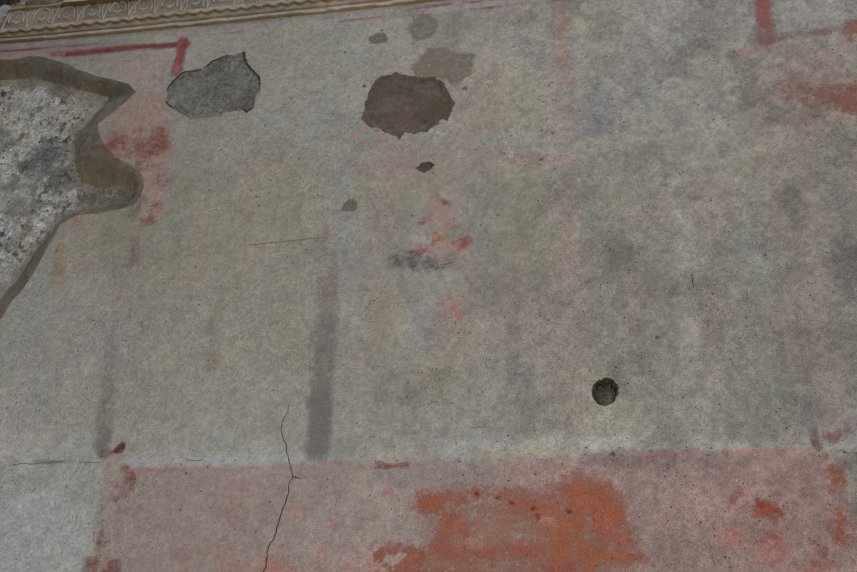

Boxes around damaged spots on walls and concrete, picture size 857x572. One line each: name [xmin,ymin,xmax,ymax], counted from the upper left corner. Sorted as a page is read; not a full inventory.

flaking render [0,56,144,318]
flaking render [165,51,261,119]
flaking render [361,72,455,140]
crack [263,404,301,572]